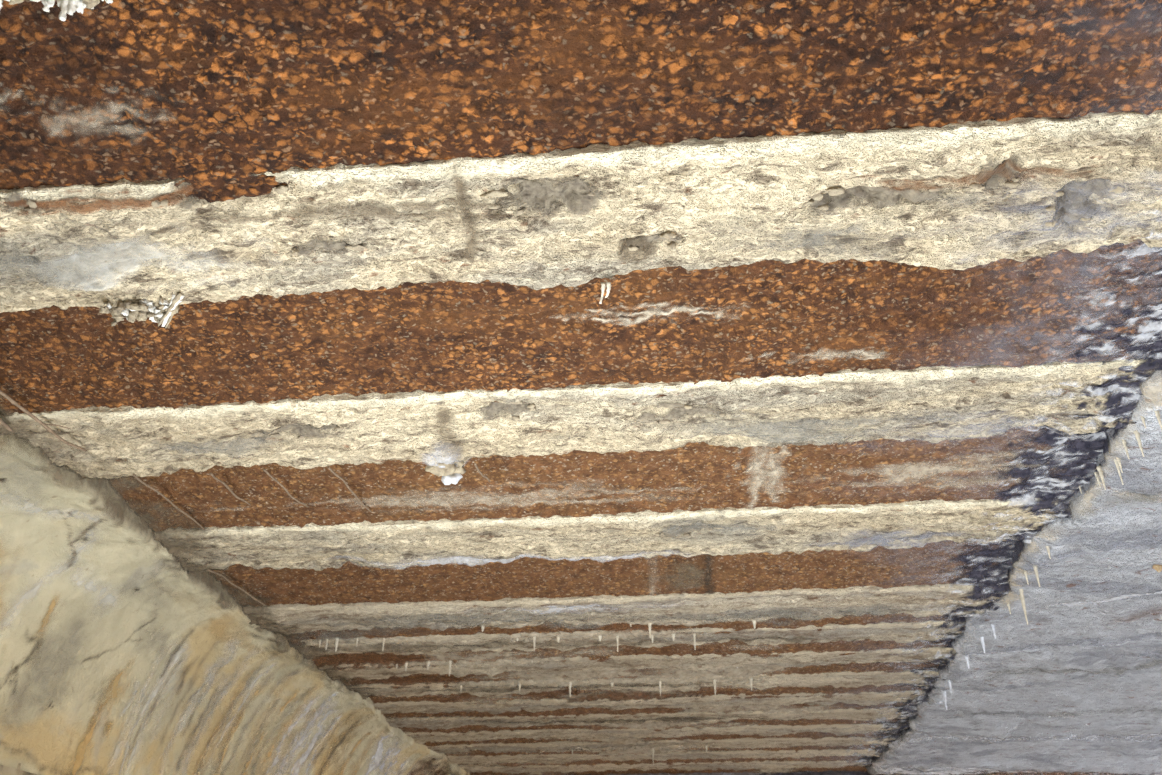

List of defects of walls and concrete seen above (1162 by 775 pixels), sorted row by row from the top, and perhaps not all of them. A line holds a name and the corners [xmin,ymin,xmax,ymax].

damp [0,0,113,21]
rust [8,181,194,215]
damp [771,293,1162,775]
rust [608,621,685,637]
rust [312,652,460,689]
rust [572,691,702,703]